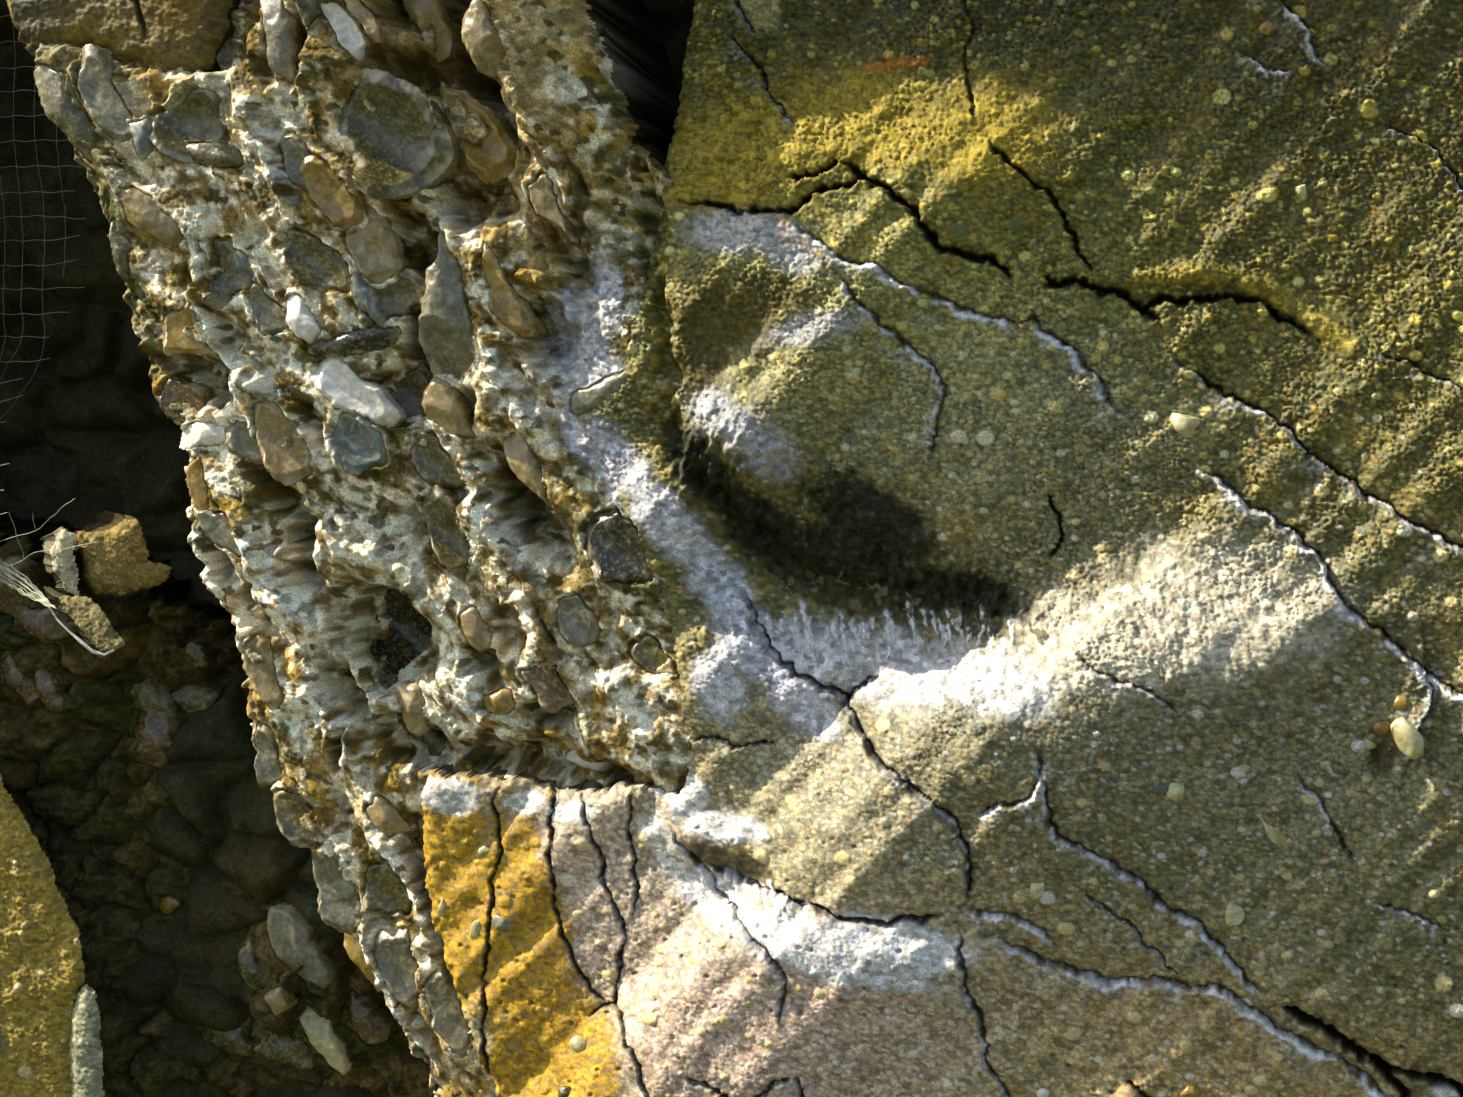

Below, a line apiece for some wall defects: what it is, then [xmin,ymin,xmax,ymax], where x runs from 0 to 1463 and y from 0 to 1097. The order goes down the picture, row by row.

crack [963,0,974,116]
damp [698,213,817,270]
damp [774,316,845,343]
crack [694,161,1113,447]
crack [991,147,1307,333]
damp [695,391,795,468]
damp [561,411,1327,739]
crack [546,785,649,1097]
damp [640,771,971,992]
crack [679,844,936,1013]
crack [749,605,1463,1097]
crack [688,1077,804,1097]